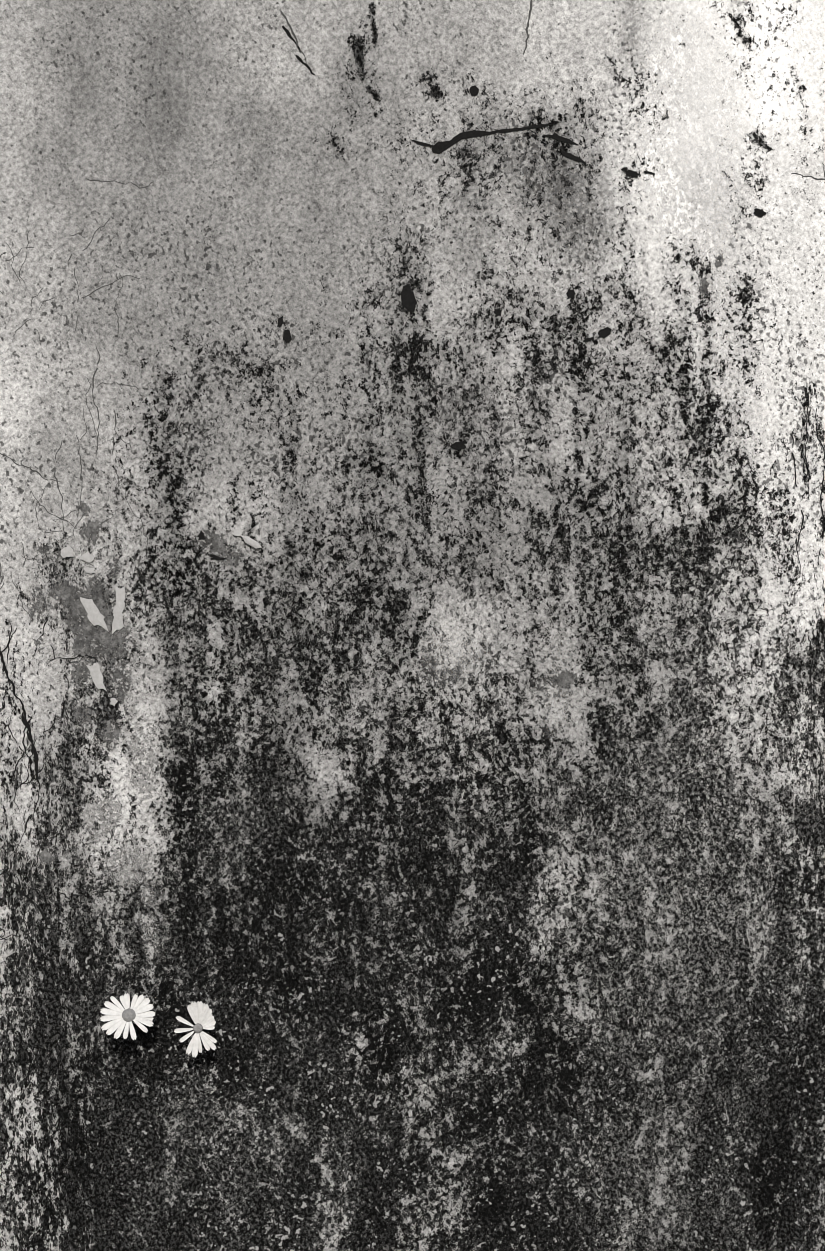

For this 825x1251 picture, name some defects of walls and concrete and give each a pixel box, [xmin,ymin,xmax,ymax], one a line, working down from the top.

crack [280,11,315,75]
crack [0,215,149,990]
peeling [29,498,159,803]
peeling [81,792,122,841]
peeling [102,843,160,991]